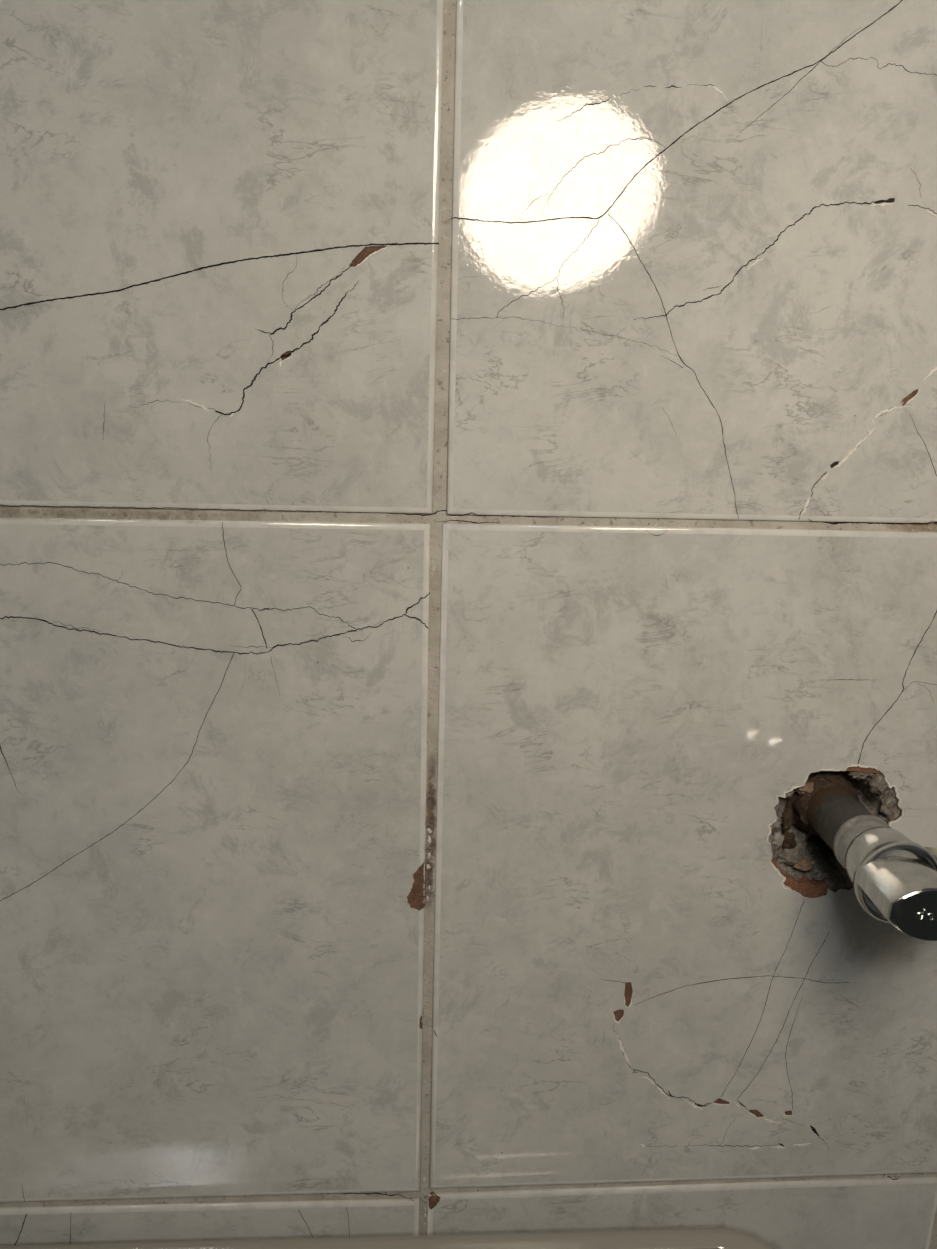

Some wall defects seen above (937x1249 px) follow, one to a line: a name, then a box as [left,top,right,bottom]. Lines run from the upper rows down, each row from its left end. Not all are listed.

crack [0,0,937,525]
crack [0,504,552,901]
crack [858,611,937,764]
spalling [407,859,426,911]
spalling [767,764,904,897]
crack [607,899,861,1150]